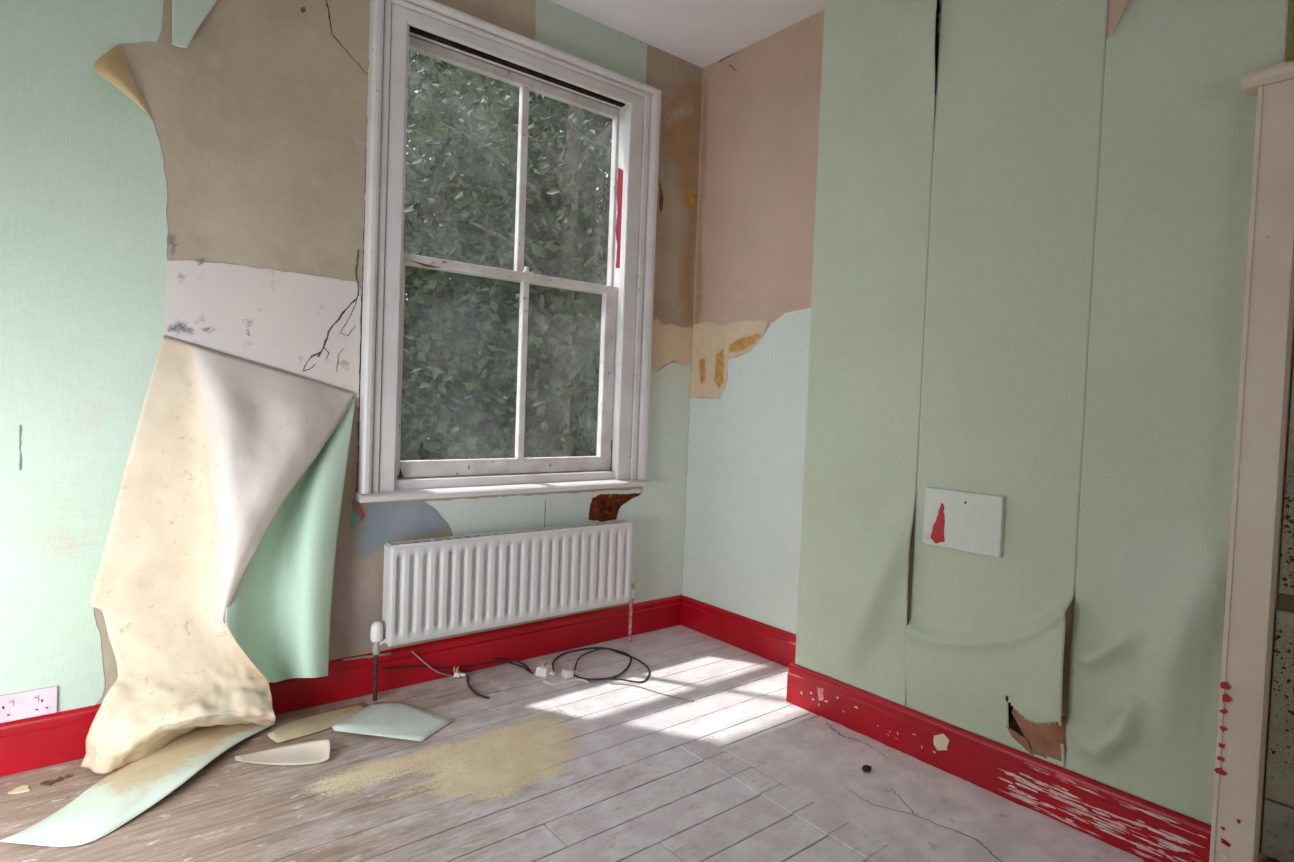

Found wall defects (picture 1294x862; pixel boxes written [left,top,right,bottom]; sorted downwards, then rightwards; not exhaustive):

peeling [94,45,152,120]
peeling [172,0,217,48]
crack [325,0,369,75]
crack [303,139,367,492]
peeling [225,398,365,683]
flaking render [588,493,640,522]
mould [1278,419,1294,599]
peeling [998,682,1240,862]
mould [1265,616,1294,778]